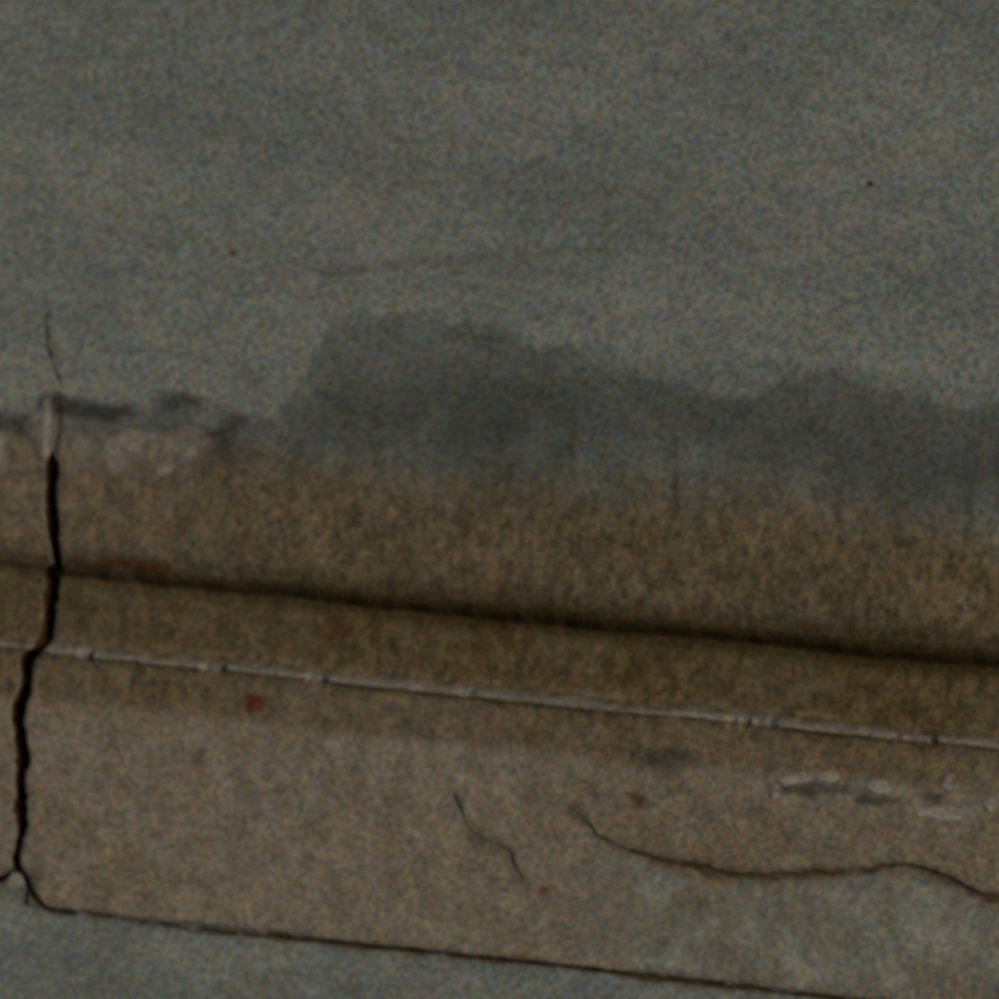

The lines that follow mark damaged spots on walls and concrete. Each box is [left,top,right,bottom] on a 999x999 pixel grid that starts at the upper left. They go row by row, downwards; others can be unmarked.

damp [322,387,571,467]
damp [738,413,999,496]
crack [0,306,854,999]
crack [575,812,999,903]